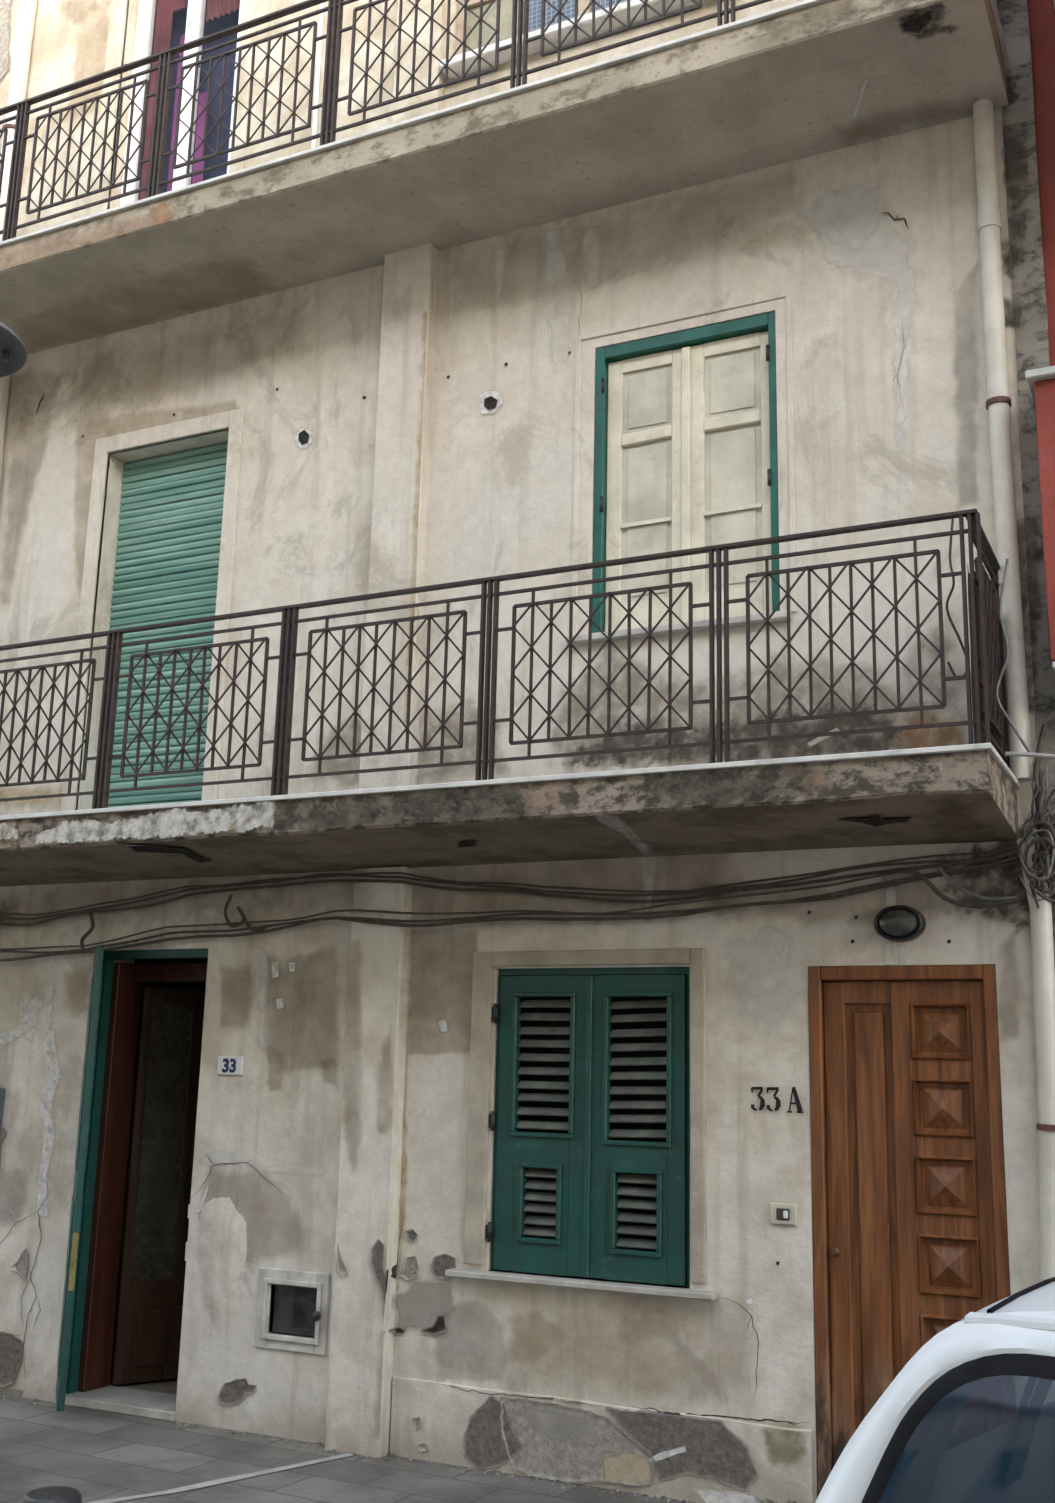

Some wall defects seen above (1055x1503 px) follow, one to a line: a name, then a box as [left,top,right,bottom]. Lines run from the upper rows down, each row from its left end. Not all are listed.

leakage [1003,125,1029,278]
leakage [1004,301,1022,327]
leakage [571,707,955,804]
leakage [0,787,522,844]
crack [188,1155,284,1201]
spalling [11,1248,28,1284]
spalling [371,1229,456,1335]
spalling [0,1333,22,1387]
spalling [218,1379,256,1406]
spalling [464,1396,759,1503]